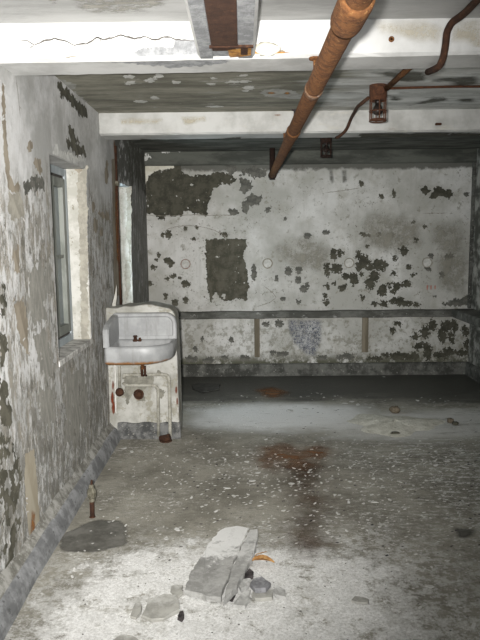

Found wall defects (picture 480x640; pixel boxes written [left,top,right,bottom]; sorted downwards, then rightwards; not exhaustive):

crack [19,34,191,58]
peeling [57,81,88,118]
peeling [1,83,45,222]
peeling [144,154,271,221]
peeling [53,124,132,339]
peeling [150,252,191,288]
peeling [204,232,257,303]
peeling [274,266,310,305]
peeling [322,232,421,308]
peeling [366,317,469,362]
peeling [0,378,40,569]
corrosion [260,446,327,518]